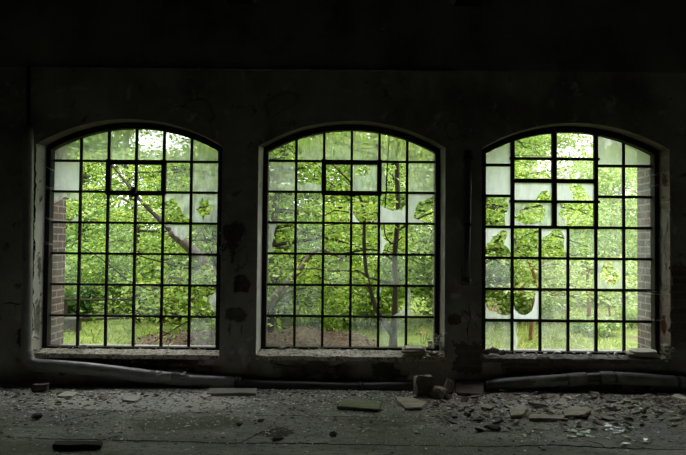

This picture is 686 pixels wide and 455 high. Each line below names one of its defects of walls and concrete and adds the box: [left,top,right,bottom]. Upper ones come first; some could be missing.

flaking render [426,312,484,378]